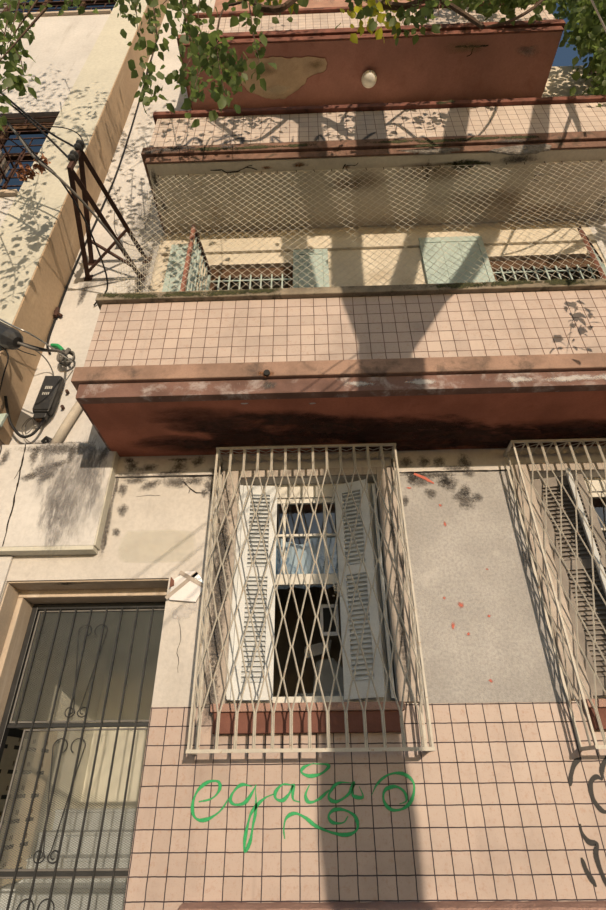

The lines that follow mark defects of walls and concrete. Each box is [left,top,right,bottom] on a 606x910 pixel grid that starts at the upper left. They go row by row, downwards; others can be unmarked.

peeling [240,56,328,100]
crack [455,45,488,56]
crack [210,165,257,176]
crack [0,444,26,546]
water stain [19,442,109,483]
water stain [114,411,606,507]
water stain [204,491,231,718]
water stain [395,555,407,673]